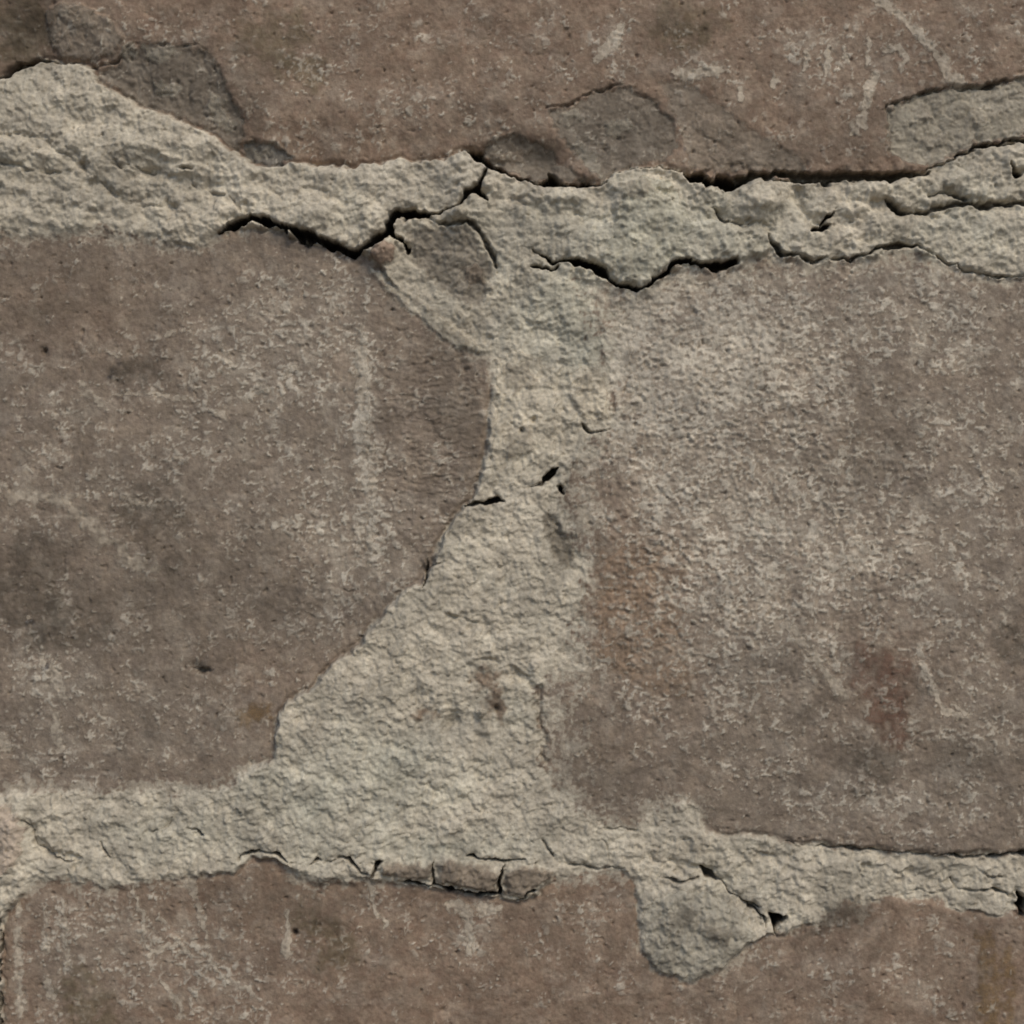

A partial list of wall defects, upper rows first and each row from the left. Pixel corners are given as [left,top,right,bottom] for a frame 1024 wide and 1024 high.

crack [954,139,1024,158]
crack [683,172,1024,216]
crack [220,155,597,263]
crack [810,215,832,232]
crack [770,241,917,265]
crack [531,252,737,293]
crack [538,467,564,495]
crack [467,497,505,506]
crack [345,856,382,877]
crack [404,853,535,899]
crack [699,864,717,879]
crack [745,900,765,917]